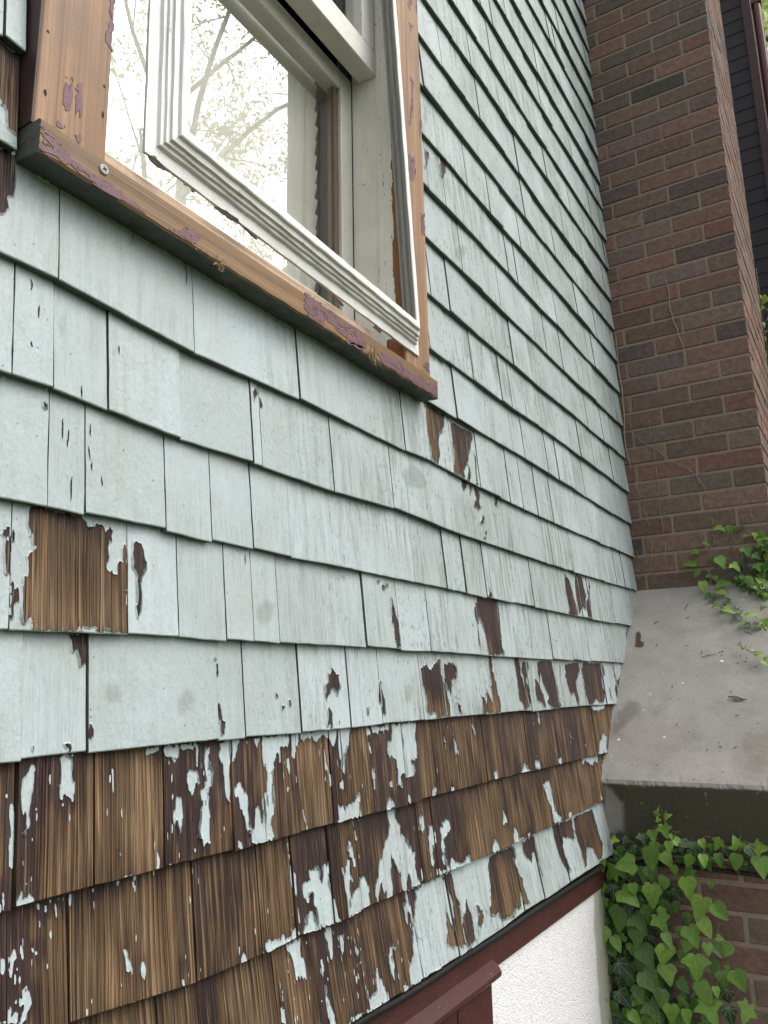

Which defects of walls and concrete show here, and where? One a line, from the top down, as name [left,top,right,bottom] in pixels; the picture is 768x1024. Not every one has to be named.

peeling [105,0,116,52]
peeling [39,77,146,214]
peeling [379,0,396,303]
peeling [407,76,447,181]
peeling [169,227,209,255]
peeling [304,292,487,540]
peeling [0,505,147,669]
peeling [0,573,620,1024]